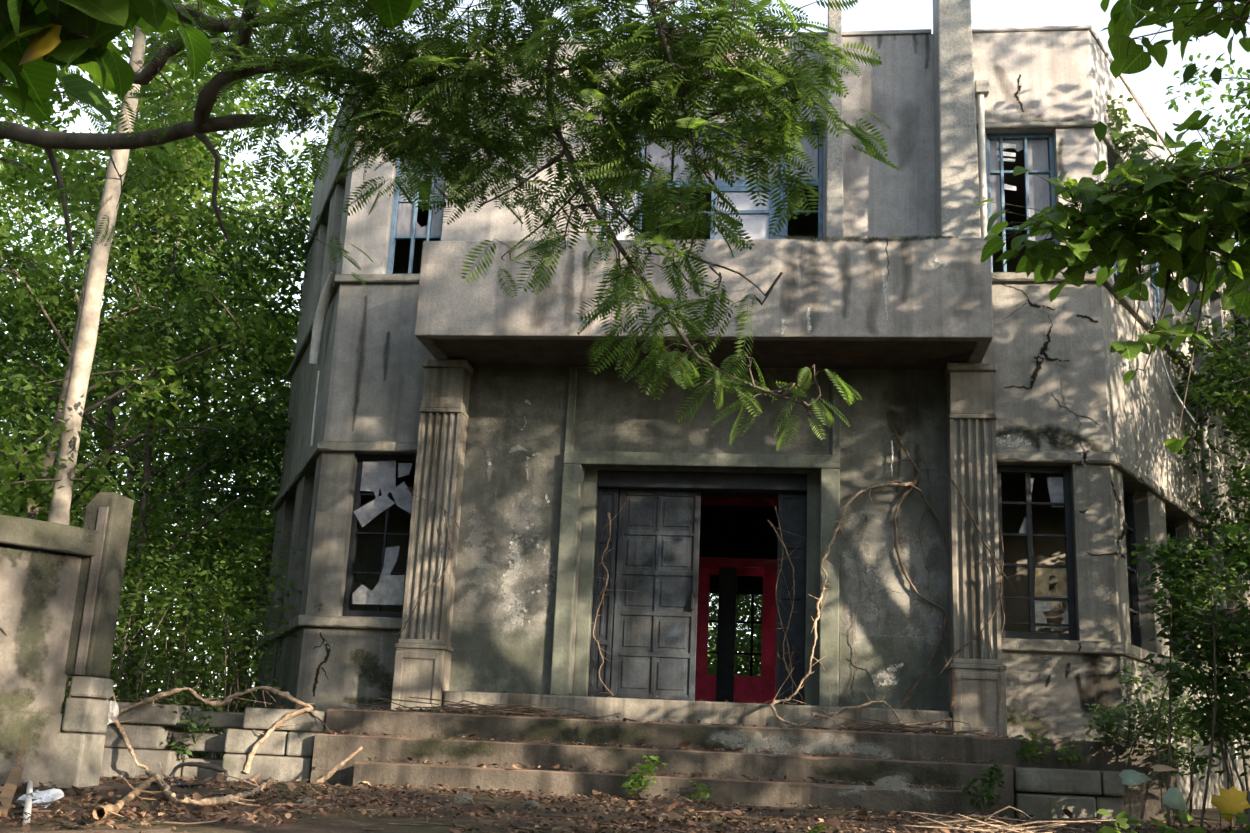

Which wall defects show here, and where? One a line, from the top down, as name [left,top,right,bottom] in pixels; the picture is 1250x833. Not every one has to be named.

crack [1014,74,1073,122]
leakage [777,235,958,335]
leakage [352,296,367,430]
leakage [996,426,1103,452]
crack [1003,284,1127,560]
leakage [0,544,67,682]
crack [312,632,333,697]
peeling [497,516,557,627]